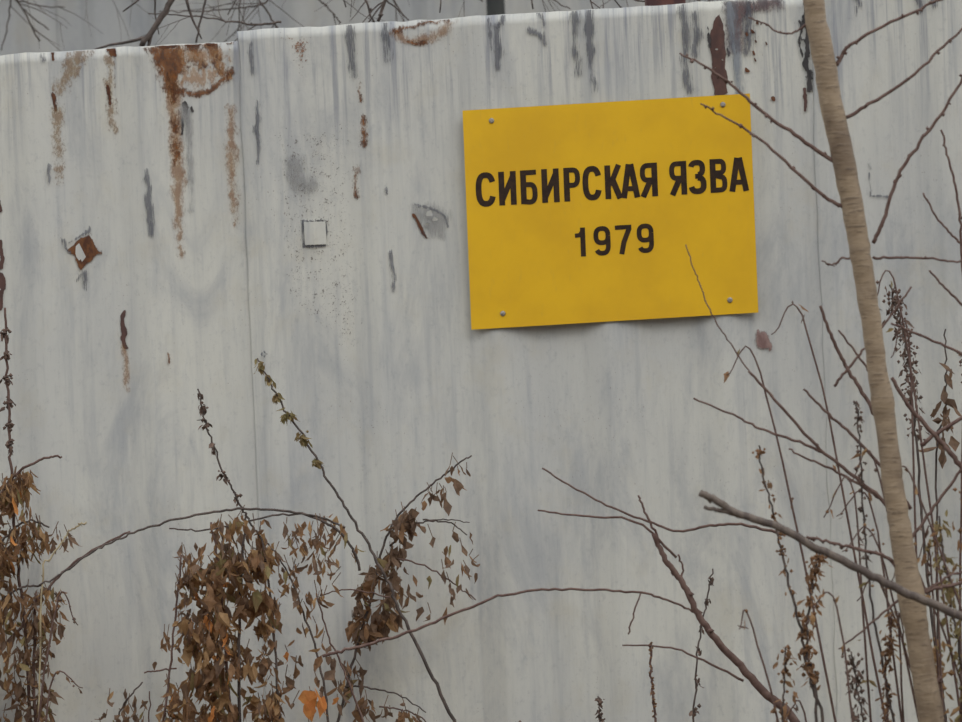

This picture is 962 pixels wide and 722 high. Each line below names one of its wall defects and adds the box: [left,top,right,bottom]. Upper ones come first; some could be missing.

rust [393,20,451,46]
rust [51,50,93,178]
rust [144,42,234,256]
rust [227,109,238,178]